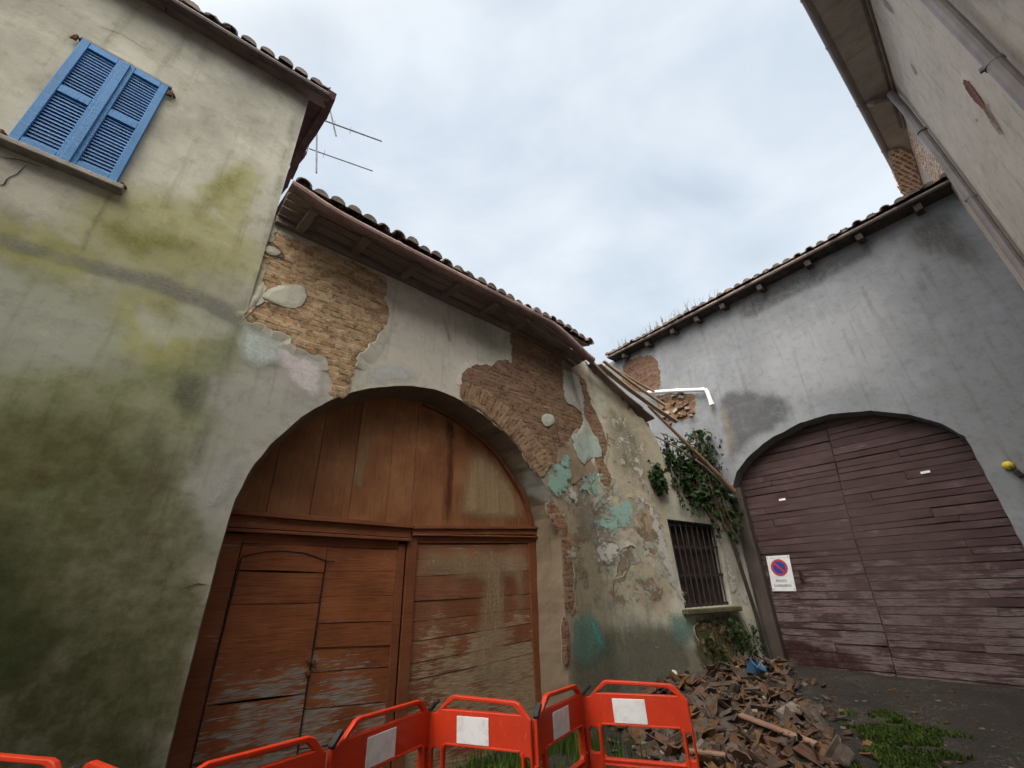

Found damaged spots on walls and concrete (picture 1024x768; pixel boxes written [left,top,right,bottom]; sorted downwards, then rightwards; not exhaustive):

spalling [960,72,1001,134]
flaking render [233,227,398,400]
flaking render [620,351,702,426]
leakage [723,392,784,451]
flaking render [455,330,686,667]